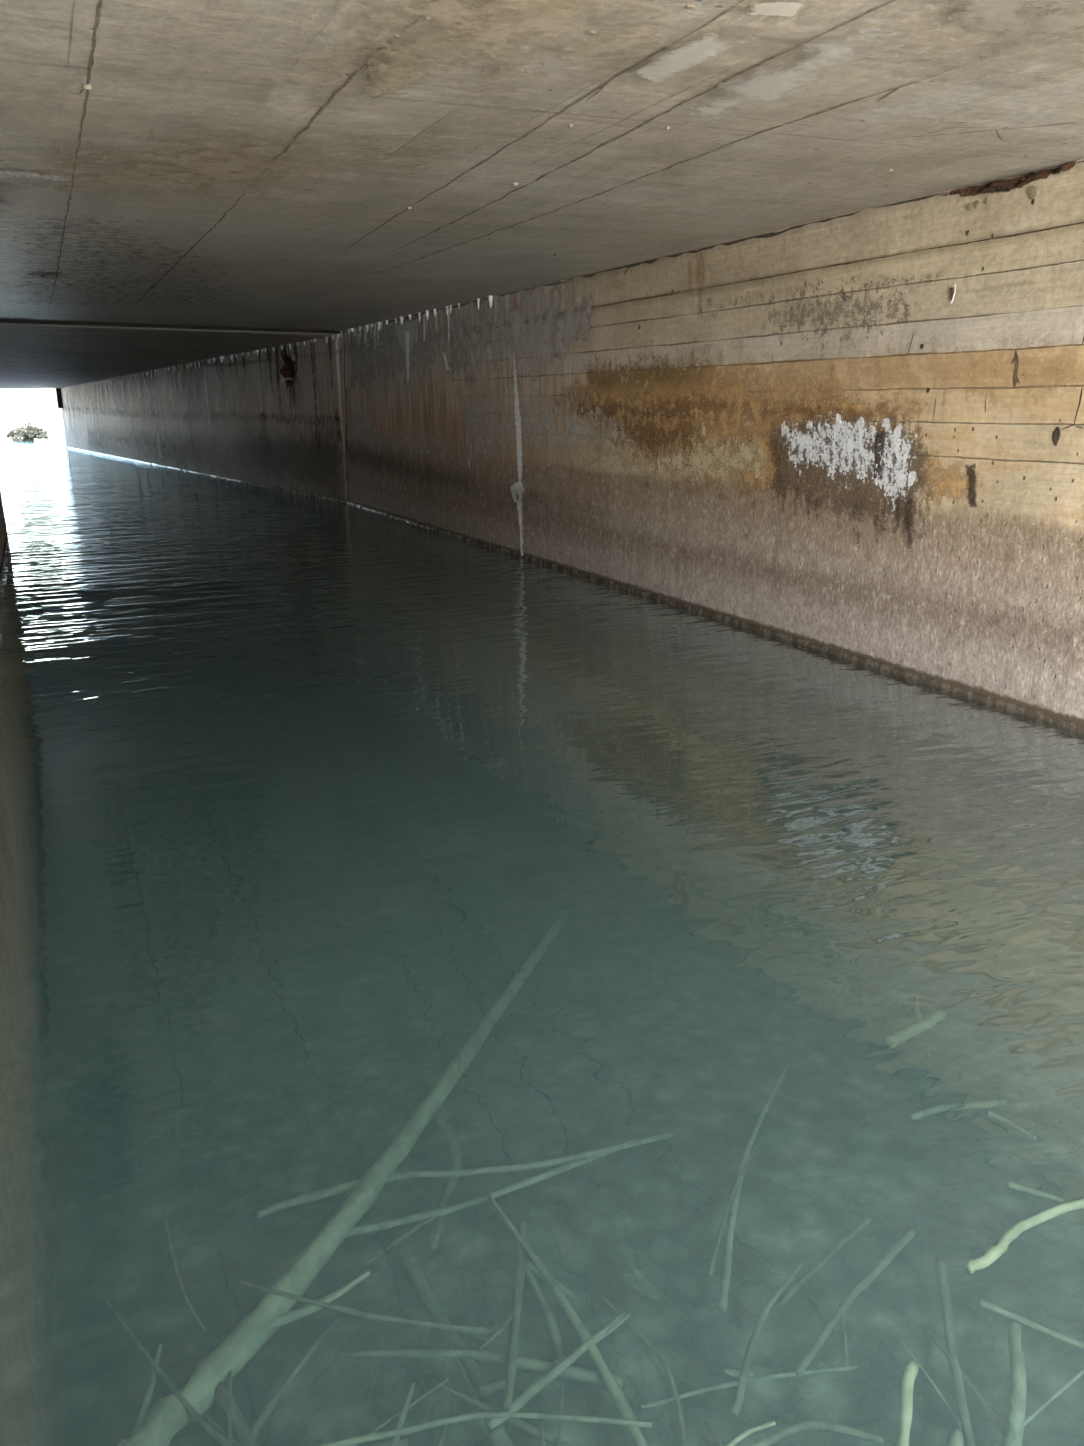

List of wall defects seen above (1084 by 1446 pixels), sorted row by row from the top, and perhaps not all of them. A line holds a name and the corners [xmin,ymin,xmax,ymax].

crack [50,0,102,304]
crack [138,0,436,301]
spalling [791,161,1084,228]
leakage [63,283,592,556]
rust [553,357,921,502]
leakage [767,411,932,546]